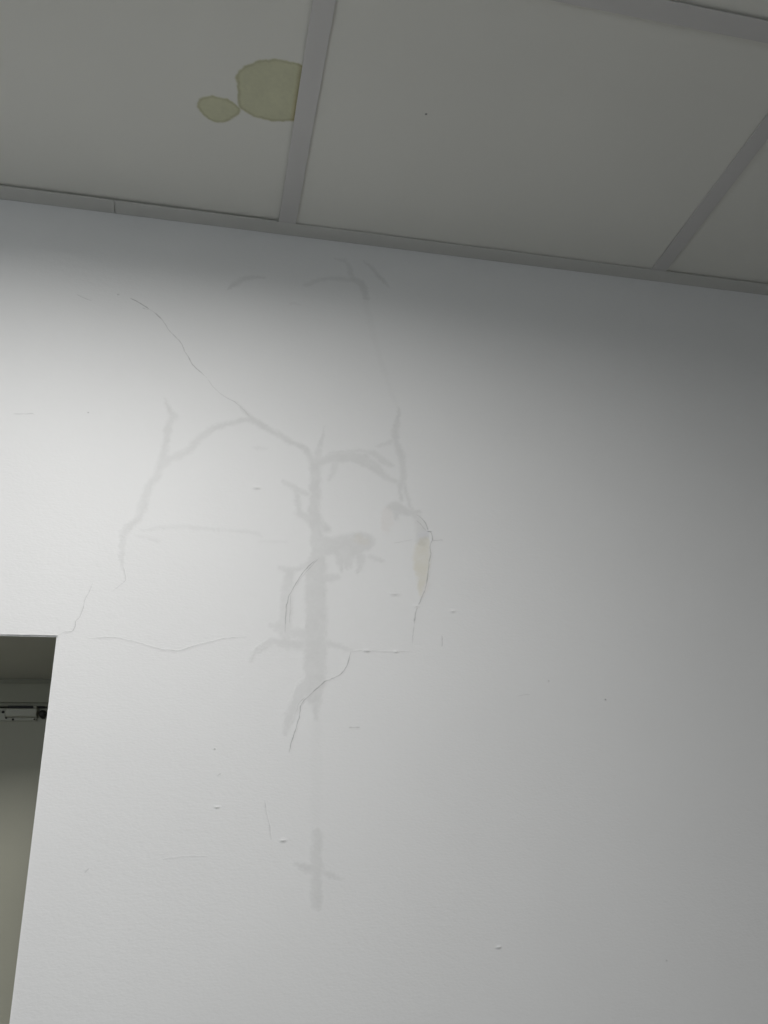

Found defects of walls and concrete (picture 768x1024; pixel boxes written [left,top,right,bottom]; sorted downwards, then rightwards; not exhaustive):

damp [195,56,303,126]
crack [57,567,247,652]
damp [117,396,429,913]
crack [284,514,444,753]